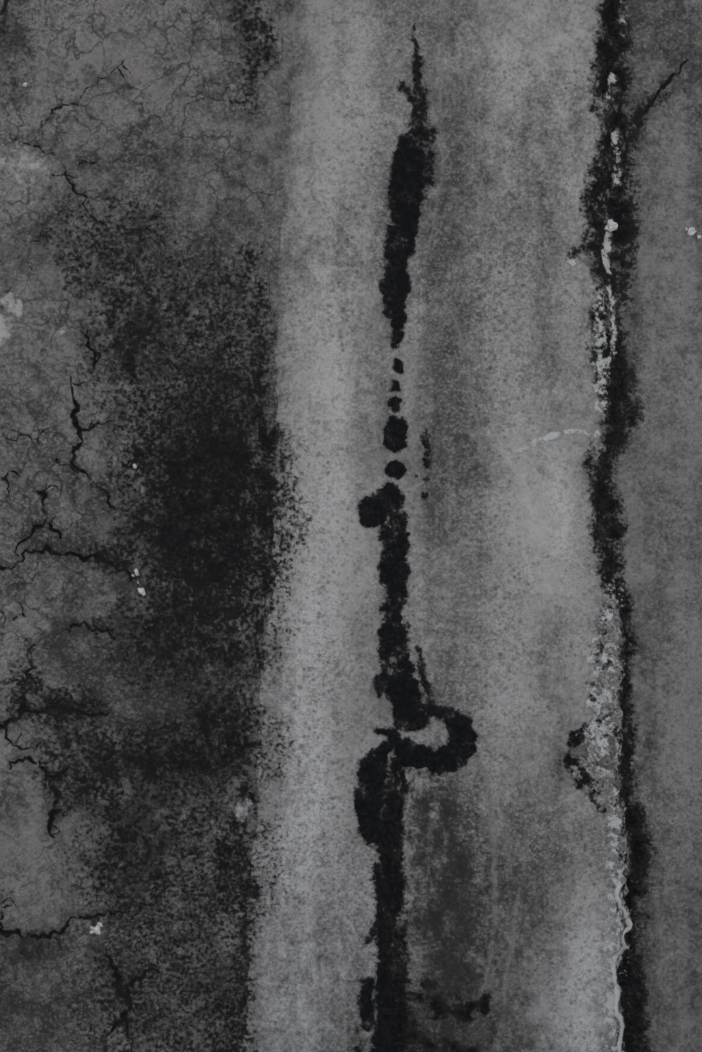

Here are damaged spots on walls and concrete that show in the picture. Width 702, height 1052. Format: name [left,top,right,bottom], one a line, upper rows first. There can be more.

crack [0,0,300,1052]
leakage [0,190,313,1052]
leakage [390,304,407,349]
leakage [397,80,413,102]
leakage [370,764,508,1052]
leakage [512,0,676,1052]